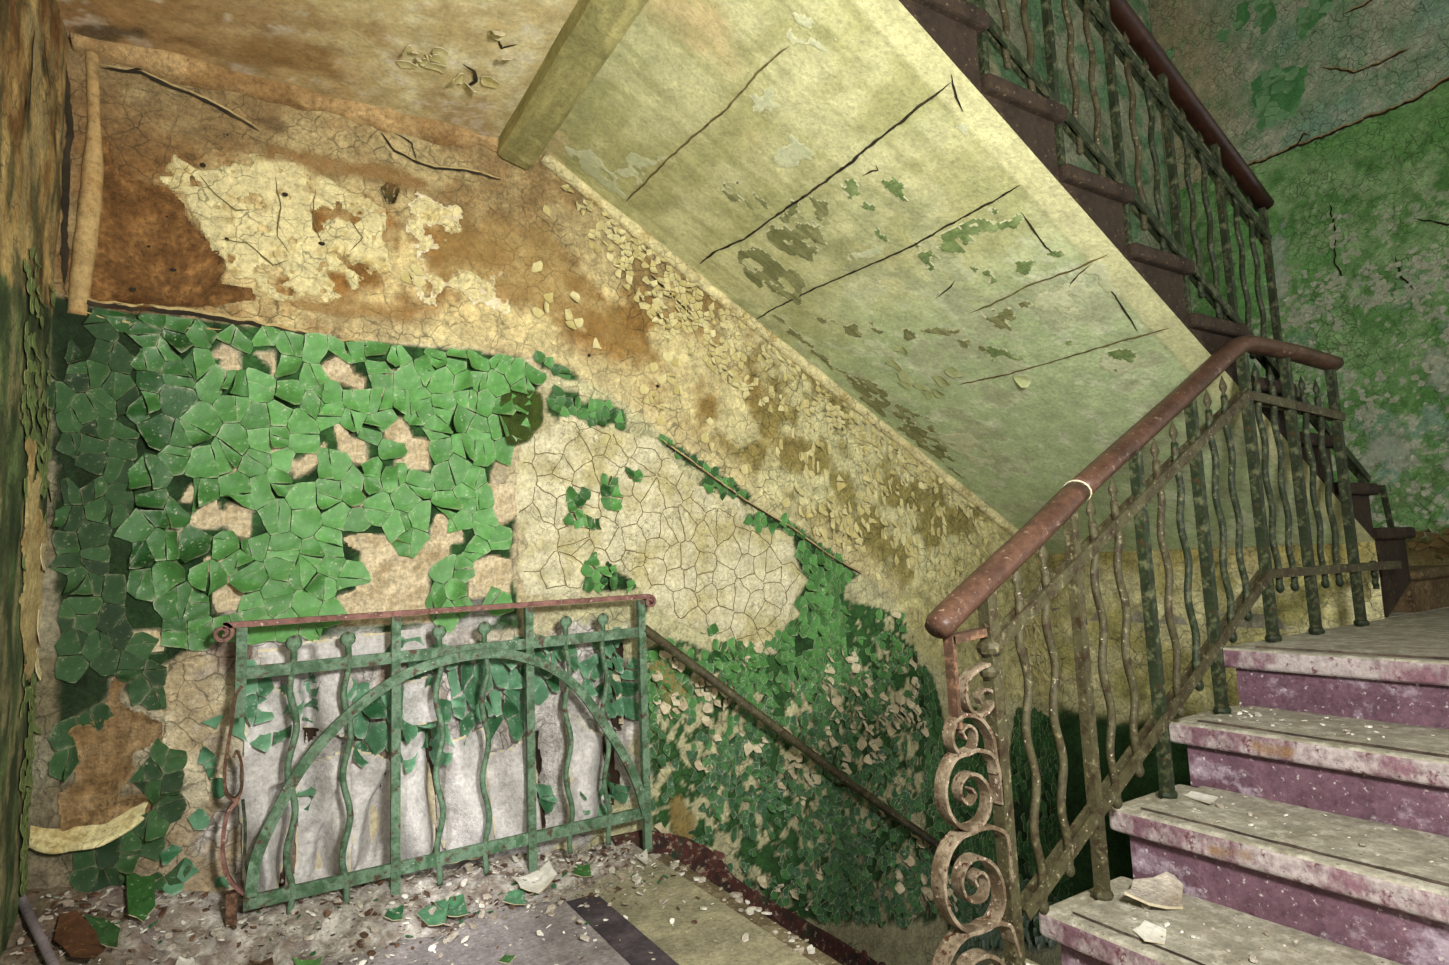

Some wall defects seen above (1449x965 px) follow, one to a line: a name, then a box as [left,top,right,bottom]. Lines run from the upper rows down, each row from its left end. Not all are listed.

crack [27,30,367,346]
crack [381,131,501,180]
crack [626,46,789,201]
crack [700,74,963,264]
crack [757,185,1169,385]
peeling [1013,247,1068,277]
peeling [1266,213,1449,392]
peeling [19,134,1031,954]
crack [515,412,861,655]
peeling [1009,611,1067,894]
peeling [1022,874,1074,965]
peeling [1124,872,1183,945]